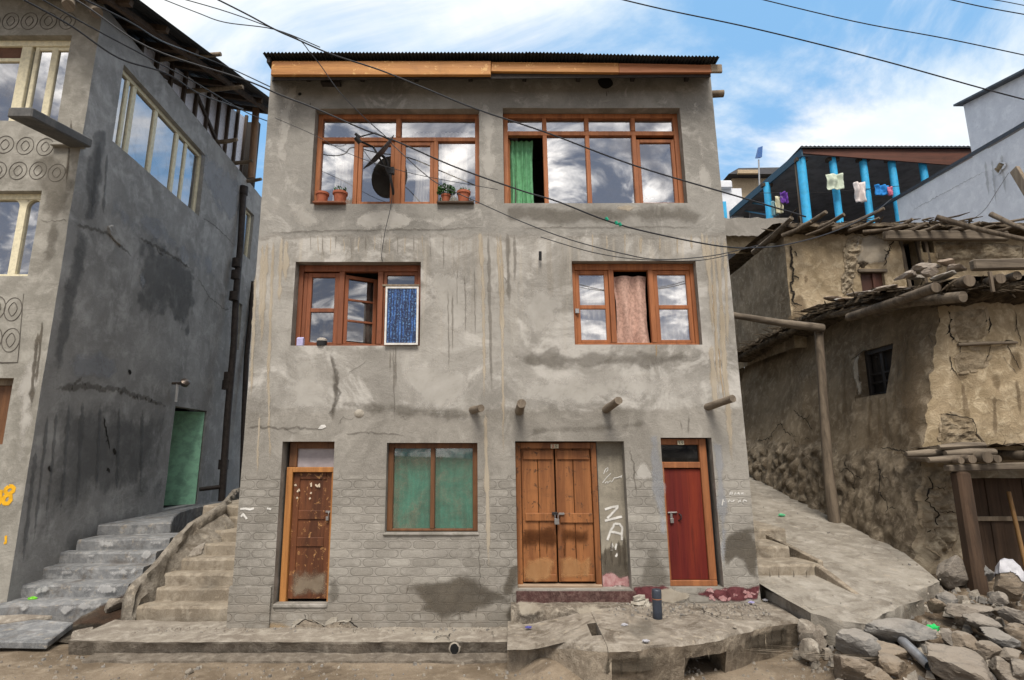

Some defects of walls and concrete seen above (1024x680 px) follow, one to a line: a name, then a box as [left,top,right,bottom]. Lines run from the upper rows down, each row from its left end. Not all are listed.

leakage [357,211,411,252]
crack [790,246,802,306]
spalling [841,234,889,295]
flaking render [937,412,985,444]
crack [925,476,955,533]
leakage [407,566,517,621]